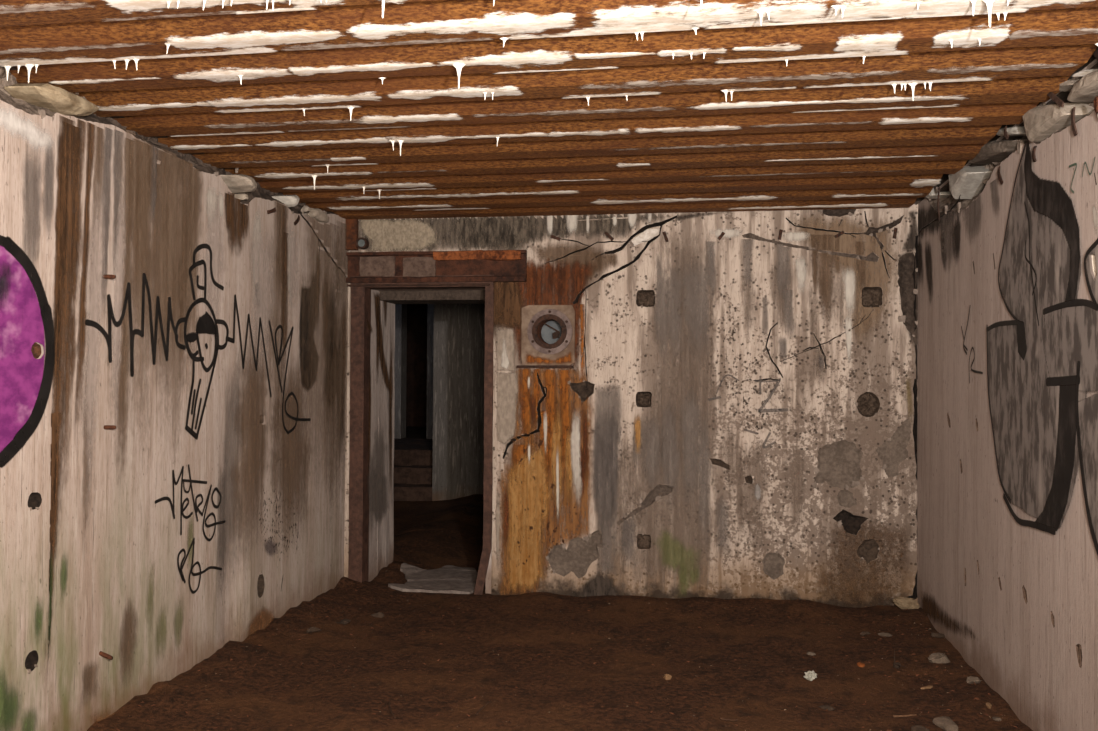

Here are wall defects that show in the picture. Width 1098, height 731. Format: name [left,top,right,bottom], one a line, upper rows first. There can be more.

leakage [0,0,1098,137]
leakage [649,142,847,150]
crack [786,211,869,237]
leakage [0,110,740,597]
rust [433,250,592,594]
crack [503,372,547,459]
crack [544,215,677,390]
leakage [232,155,999,597]
crack [882,195,961,479]
peeling [545,529,603,578]
spalling [616,484,674,526]
leakage [0,680,36,731]